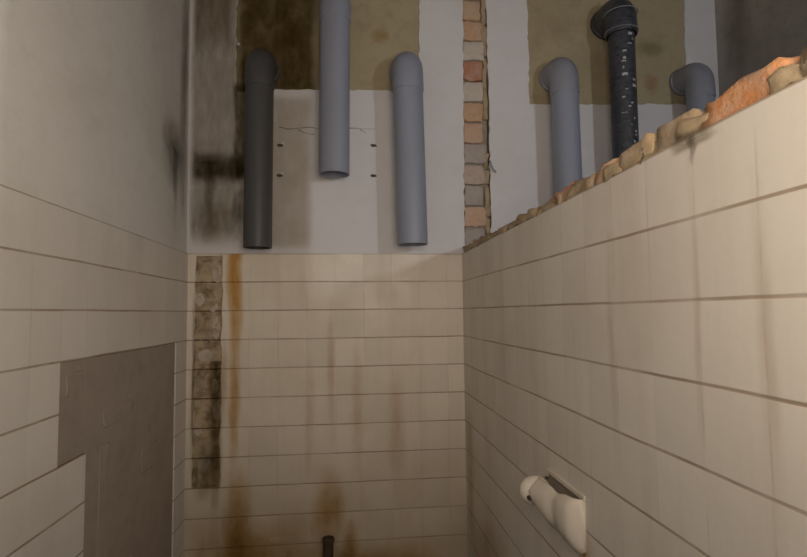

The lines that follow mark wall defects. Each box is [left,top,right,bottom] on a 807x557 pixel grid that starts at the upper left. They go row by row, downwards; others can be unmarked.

water stain [196,88,245,177]
spalling [462,0,807,253]
spalling [192,255,223,489]